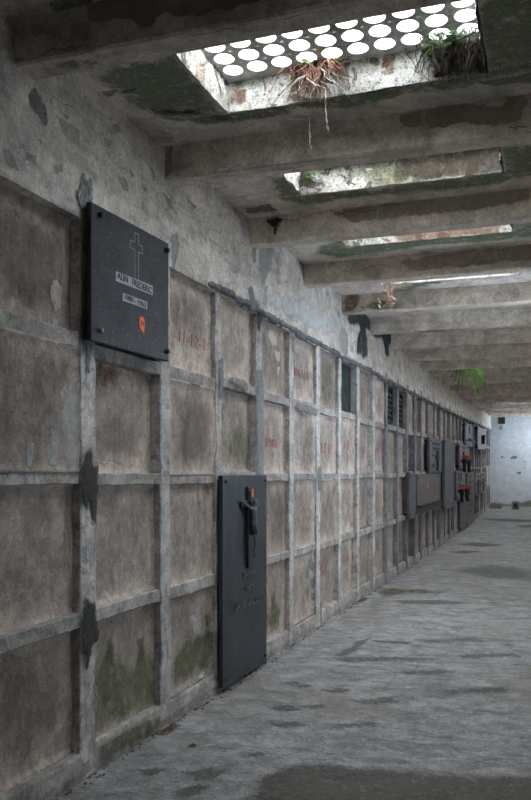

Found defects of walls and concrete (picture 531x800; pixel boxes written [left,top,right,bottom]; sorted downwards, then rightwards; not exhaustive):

damp [150,108,232,124]
damp [400,95,528,128]
damp [335,188,530,222]
damp [402,245,531,270]